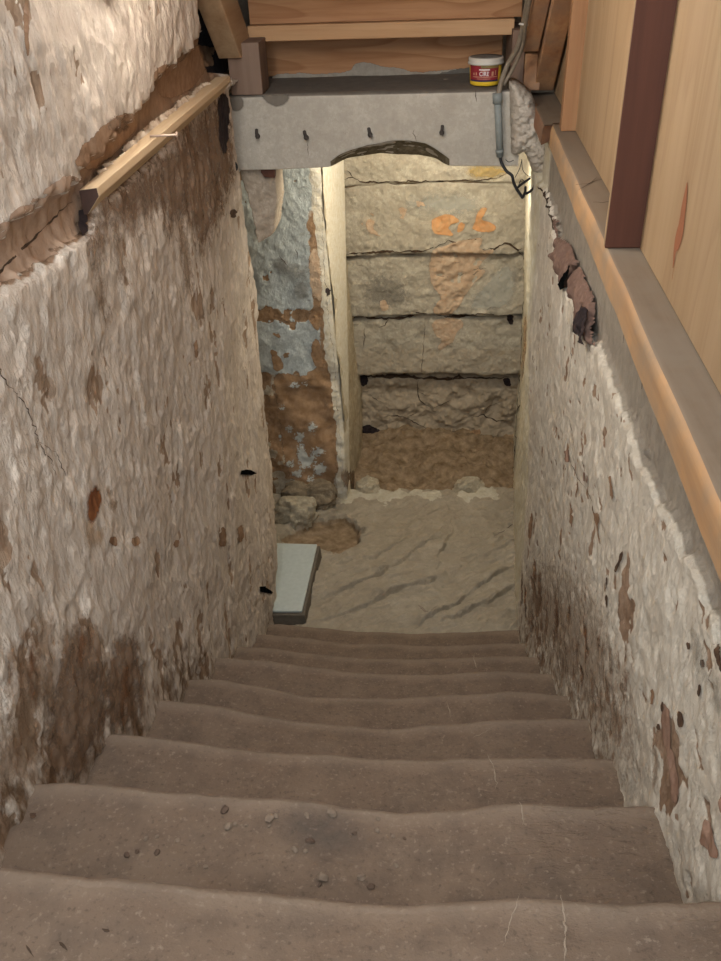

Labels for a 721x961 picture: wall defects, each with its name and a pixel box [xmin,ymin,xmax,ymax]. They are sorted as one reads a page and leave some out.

flaking render [154,45,215,98]
flaking render [0,113,136,287]
flaking render [548,215,596,346]
peeling [269,249,338,484]
damp [521,561,541,632]
damp [0,617,146,782]
flaking render [699,819,718,858]